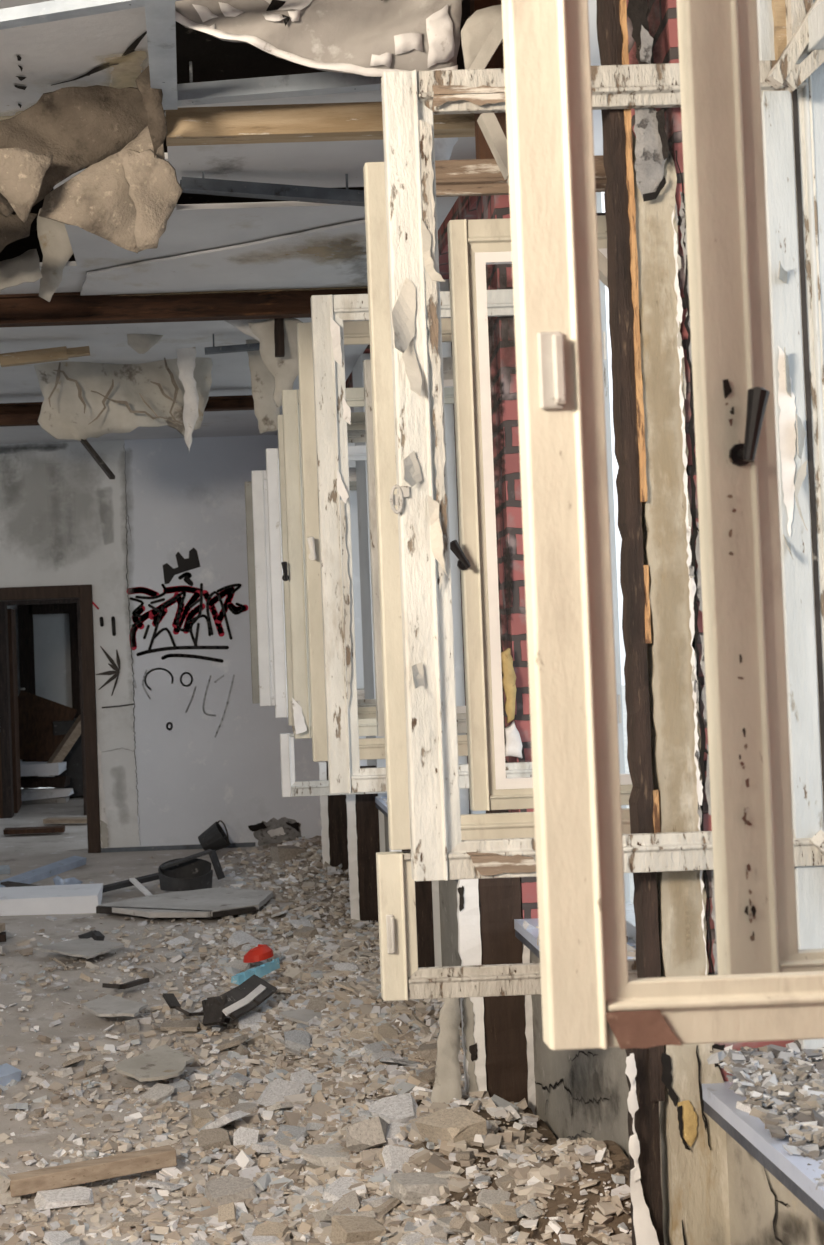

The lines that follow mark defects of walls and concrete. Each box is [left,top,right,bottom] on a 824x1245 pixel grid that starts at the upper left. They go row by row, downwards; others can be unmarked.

peeling [192,2,243,29]
peeling [263,0,313,22]
peeling [370,4,455,68]
peeling [432,85,506,107]
peeling [391,120,448,591]
crack [48,358,184,426]
peeling [411,663,425,689]
peeling [466,852,536,876]